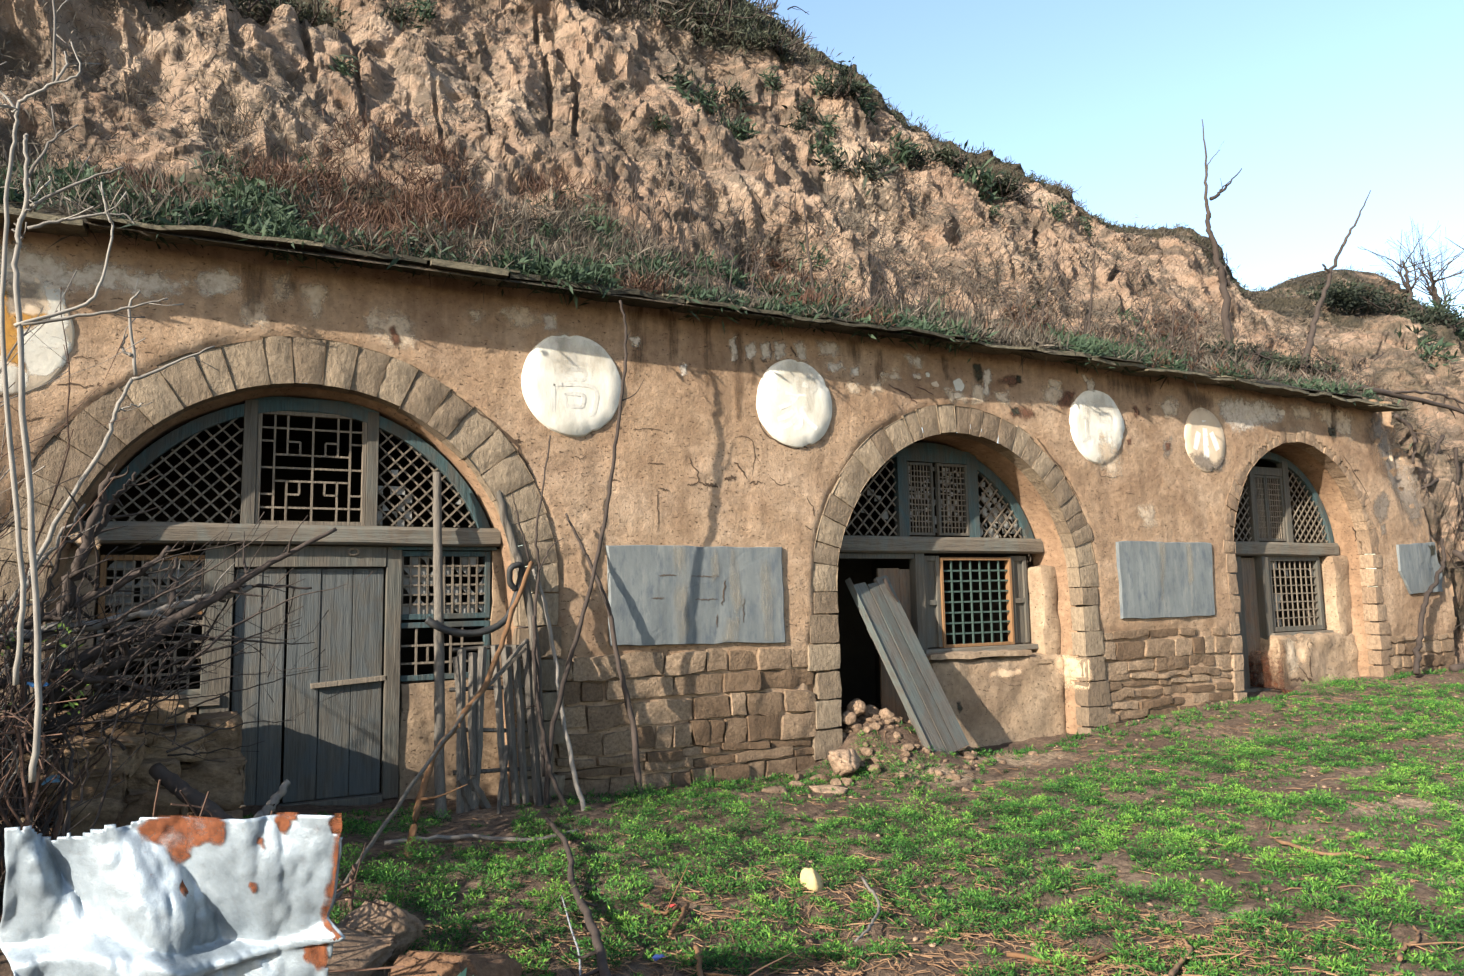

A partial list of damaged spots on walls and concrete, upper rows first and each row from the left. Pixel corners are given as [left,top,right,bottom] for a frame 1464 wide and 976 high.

flaking render [729,336,1095,418]
rust [137,815,225,897]
rust [274,812,298,834]
rust [303,813,342,970]